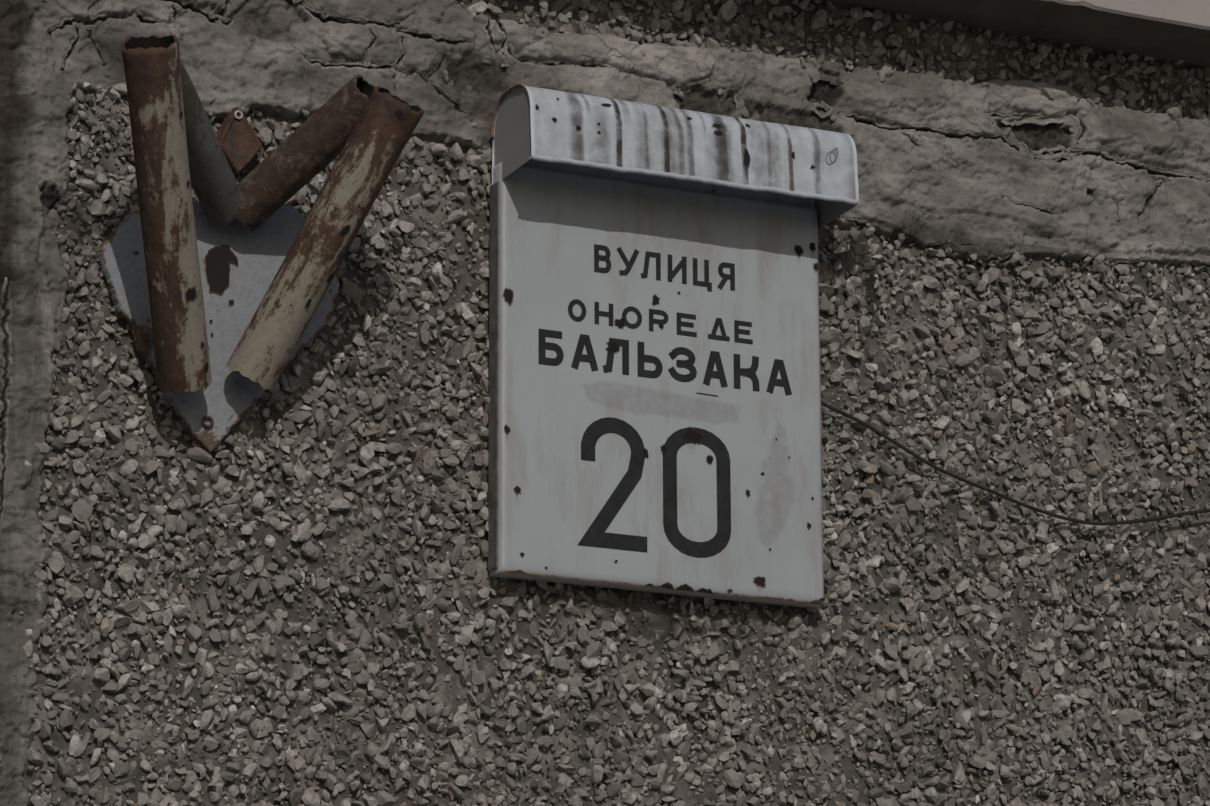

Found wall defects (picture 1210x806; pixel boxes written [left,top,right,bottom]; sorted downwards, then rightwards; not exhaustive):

crack [41,0,234,70]
crack [292,0,680,121]
crack [838,88,1210,229]
spalling [995,115,1079,163]
rust [204,245,238,305]
crack [839,215,1035,268]
crack [1077,256,1210,271]
crack [0,277,14,529]